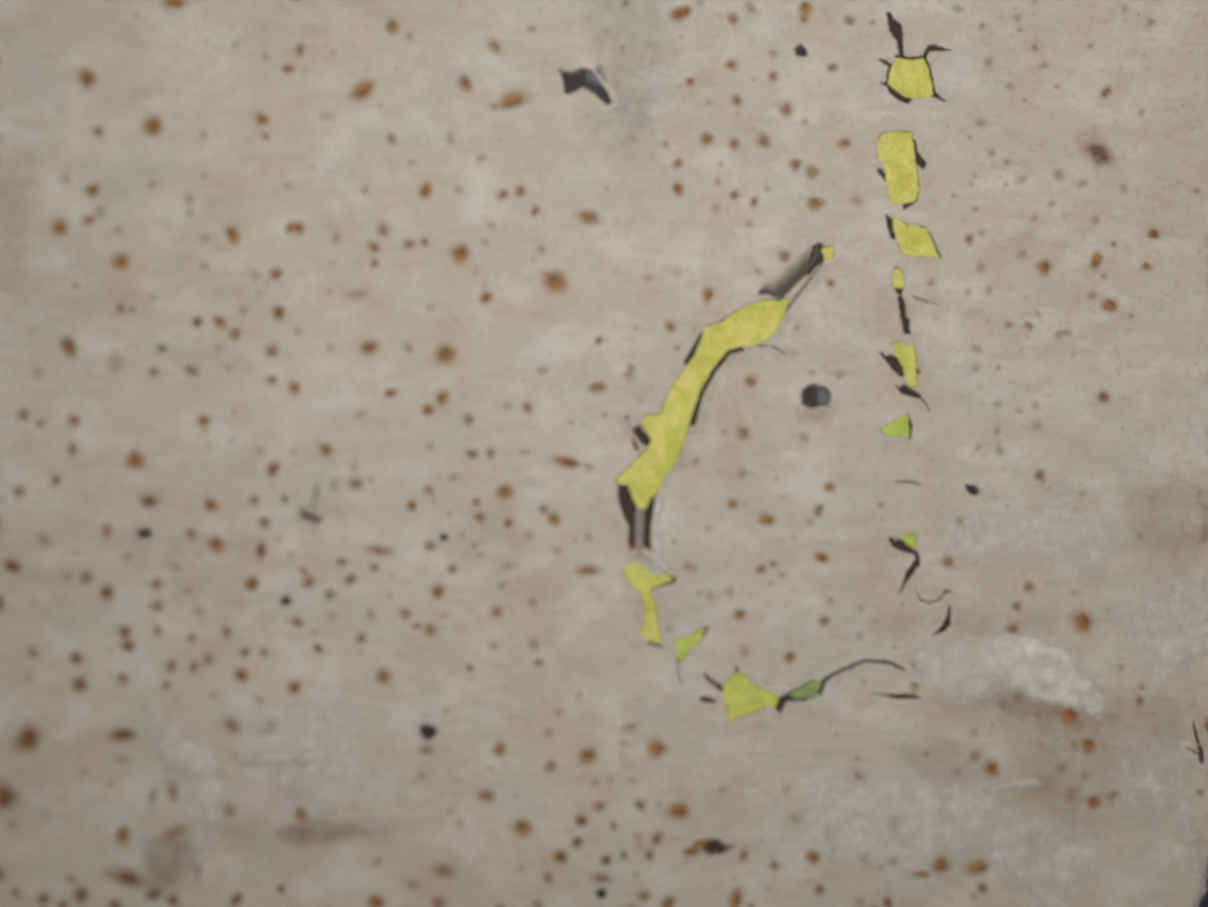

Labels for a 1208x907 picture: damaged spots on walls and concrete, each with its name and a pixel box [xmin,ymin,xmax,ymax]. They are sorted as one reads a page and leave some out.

rust [672,7,690,19]
rust [500,94,522,107]
rust [144,119,160,135]
peeling [862,1,962,451]
rust [546,274,564,290]
rust [558,458,578,467]
peeling [604,232,917,732]
crack [885,469,931,495]
crack [908,579,962,646]
crack [862,683,931,709]
rust [17,729,37,749]
rust [554,803,603,861]